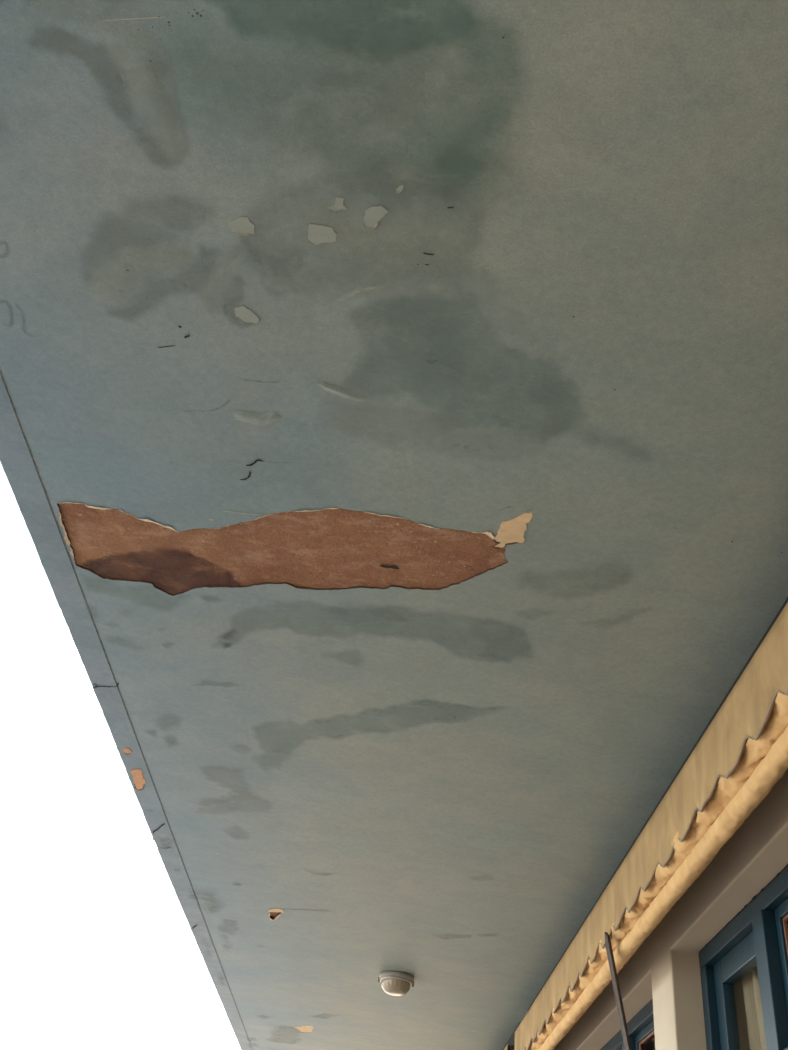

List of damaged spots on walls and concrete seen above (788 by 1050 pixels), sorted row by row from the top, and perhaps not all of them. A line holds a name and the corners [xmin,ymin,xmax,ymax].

peeling [363,205,389,229]
peeling [307,223,337,245]
spalling [57,502,533,596]
peeling [130,769,147,790]
spalling [268,908,284,921]